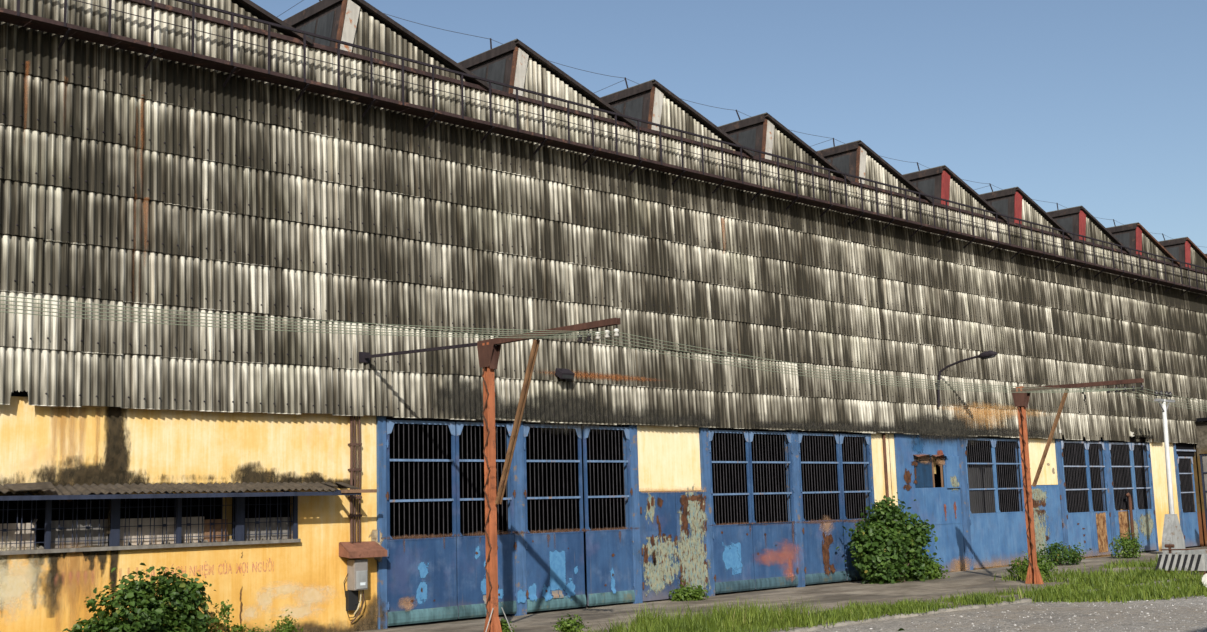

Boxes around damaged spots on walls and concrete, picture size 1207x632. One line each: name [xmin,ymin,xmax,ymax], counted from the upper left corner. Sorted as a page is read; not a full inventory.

leakage [0,407,213,616]
leakage [233,463,354,488]
peeling [641,486,743,597]
peeling [1032,488,1052,563]
peeling [411,562,435,604]